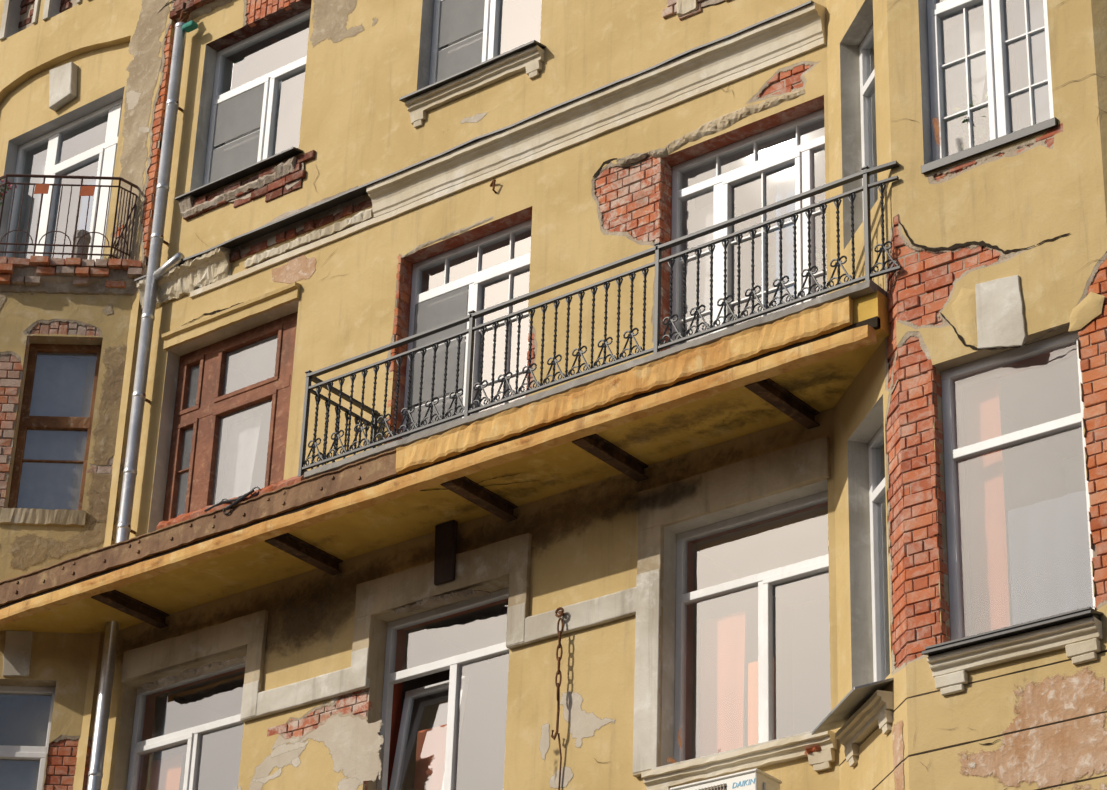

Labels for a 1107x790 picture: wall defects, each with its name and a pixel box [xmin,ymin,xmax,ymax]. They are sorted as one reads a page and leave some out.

flaking render [243,0,299,27]
flaking render [310,0,378,47]
flaking render [592,61,820,351]
crack [898,215,1070,253]
flaking render [0,319,102,361]
crack [940,312,1068,351]
damp [456,459,695,554]
spalling [886,454,905,626]
damp [122,565,390,655]
peeling [237,686,384,790]
peeling [560,691,615,748]
peeling [958,666,1107,790]